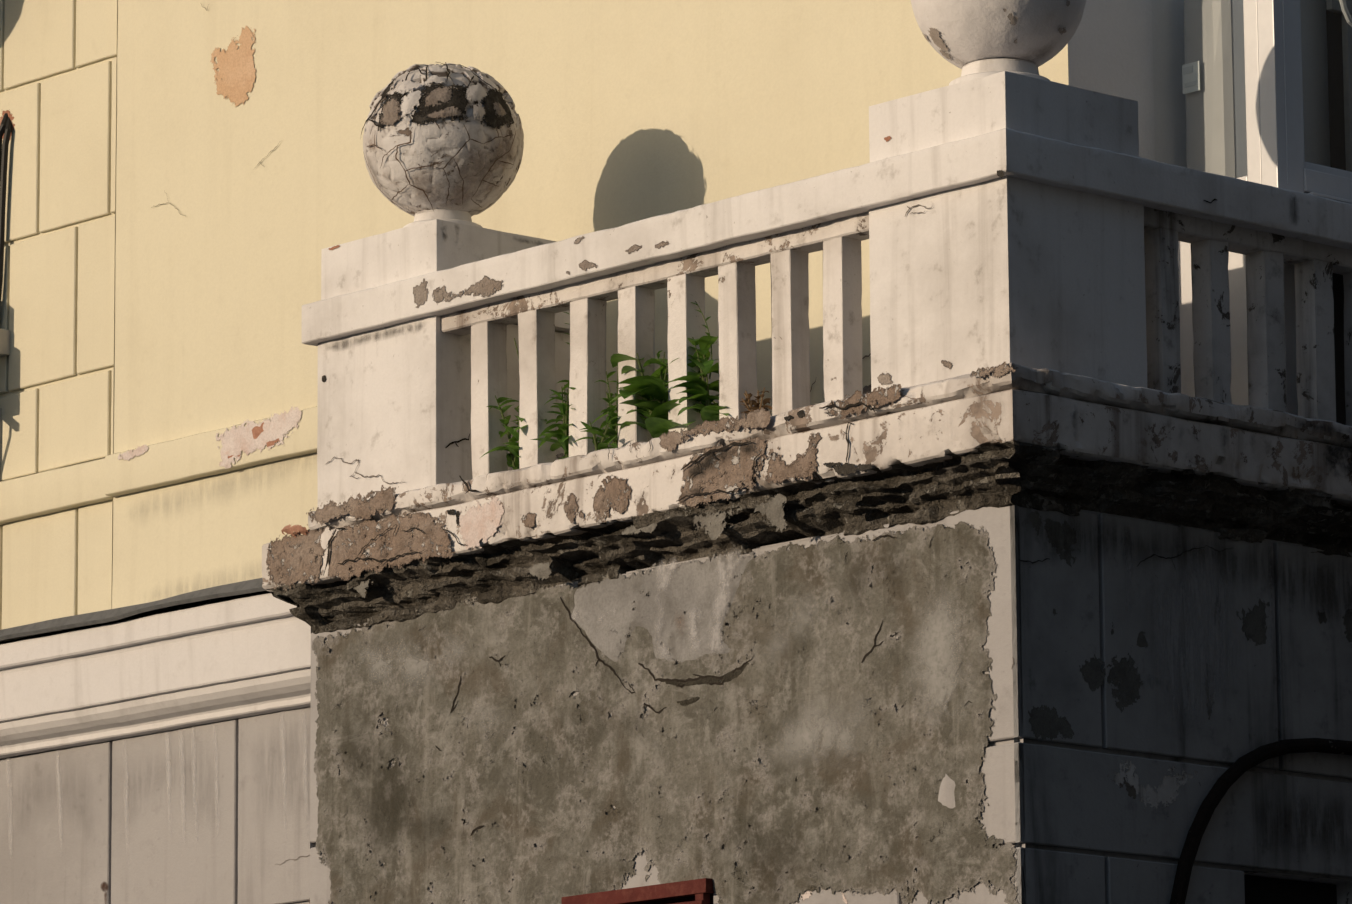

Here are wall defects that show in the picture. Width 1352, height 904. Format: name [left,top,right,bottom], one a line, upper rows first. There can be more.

peeling [210,26,256,107]
crack [360,62,516,211]
spalling [377,75,514,131]
peeling [413,275,503,308]
spalling [824,373,901,419]
spalling [266,485,504,598]
peeling [564,407,873,662]
crack [560,597,754,713]
damp [1080,631,1149,713]
damp [1213,597,1270,646]
damp [1028,705,1074,741]
peeling [938,774,955,809]